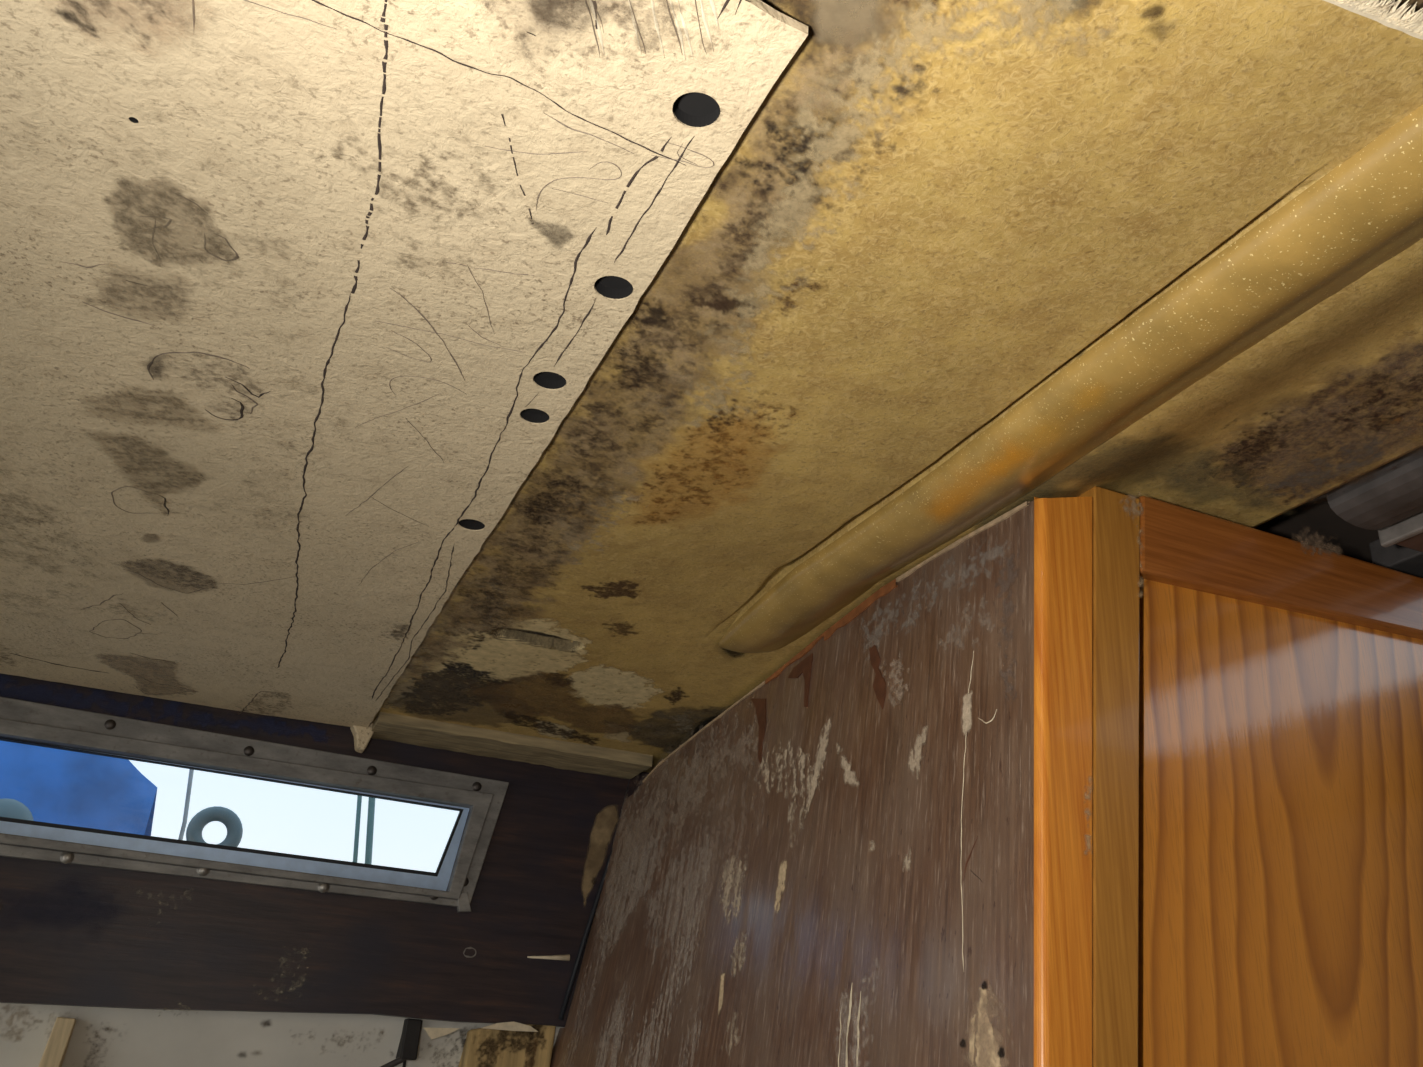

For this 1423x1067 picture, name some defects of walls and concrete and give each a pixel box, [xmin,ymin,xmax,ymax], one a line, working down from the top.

water stain [105,181,208,262]
water stain [192,233,239,261]
crack [221,0,388,668]
water stain [391,0,1074,753]
water stain [1022,345,1423,505]
peeling [384,618,664,743]
peeling [788,719,859,825]
peeling [909,728,926,774]
spalling [962,693,997,734]